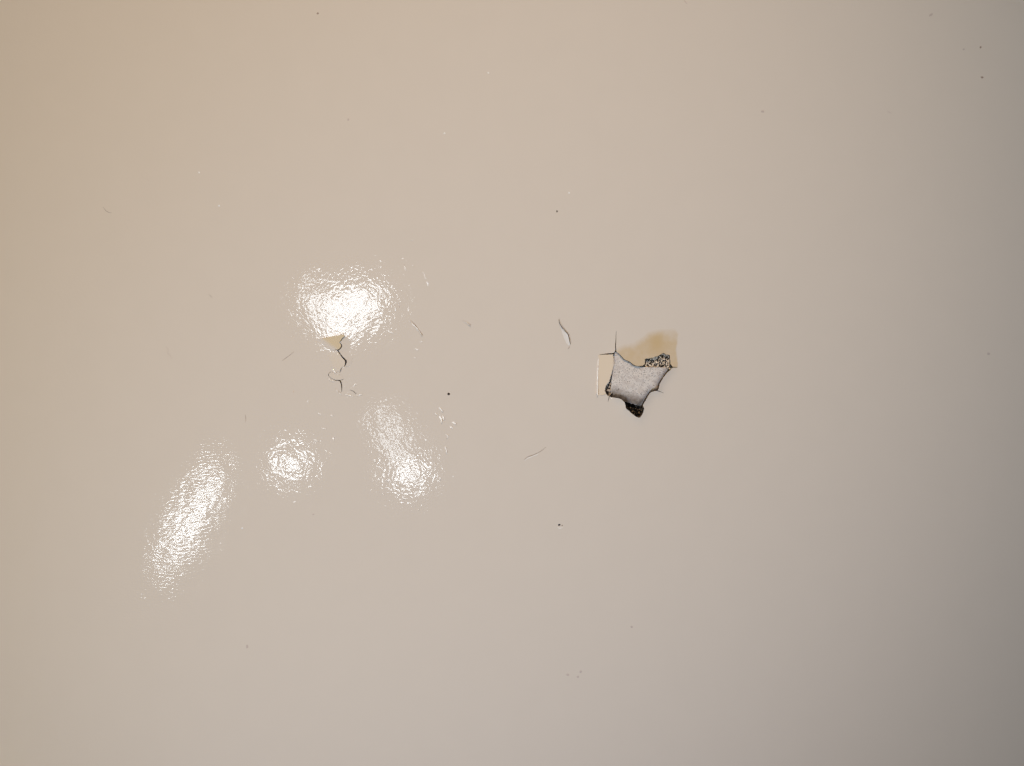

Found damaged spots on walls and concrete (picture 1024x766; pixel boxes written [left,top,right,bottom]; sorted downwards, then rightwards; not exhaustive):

crack [316,334,362,397]
spalling [575,320,700,446]
water stain [616,329,678,368]